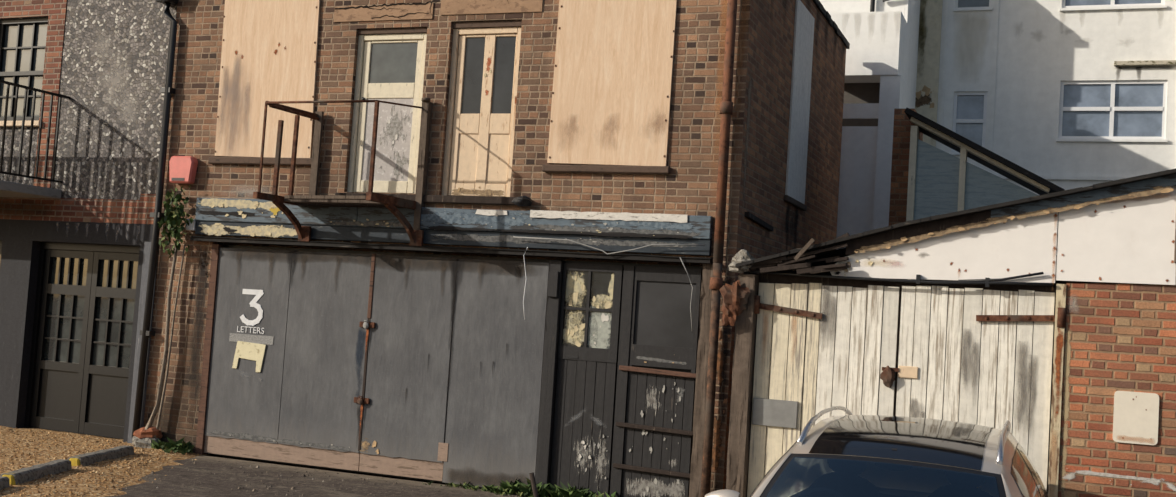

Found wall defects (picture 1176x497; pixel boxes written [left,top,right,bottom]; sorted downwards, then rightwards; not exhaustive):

crack [335,0,437,19]
peeling [198,198,297,238]
peeling [452,187,504,197]
peeling [427,211,700,248]
peeling [563,271,614,349]
damp [1018,347,1036,413]
peeling [640,382,685,466]
peeling [573,429,609,481]